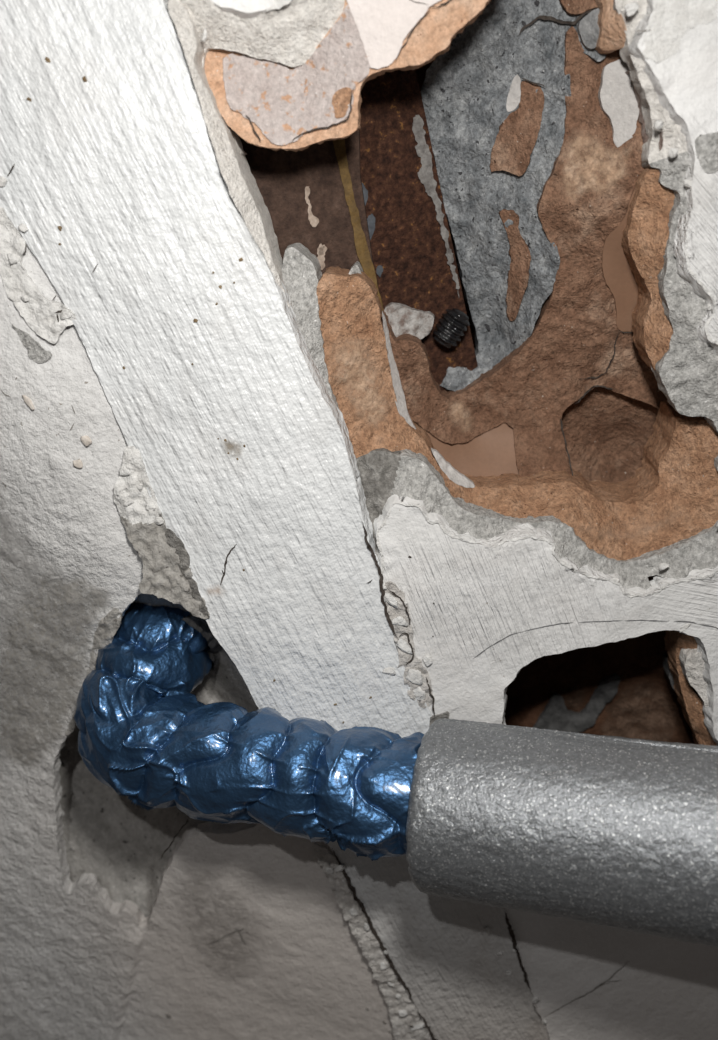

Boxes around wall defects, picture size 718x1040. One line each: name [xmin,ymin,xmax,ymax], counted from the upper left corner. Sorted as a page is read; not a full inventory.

flaking render [178,0,345,72]
flaking render [233,133,247,155]
spalling [316,0,718,598]
flaking render [86,446,210,677]
flaking render [191,648,259,713]
crack [363,525,435,717]
spalling [663,630,718,746]
flaking render [59,708,208,917]
crack [314,842,437,1040]